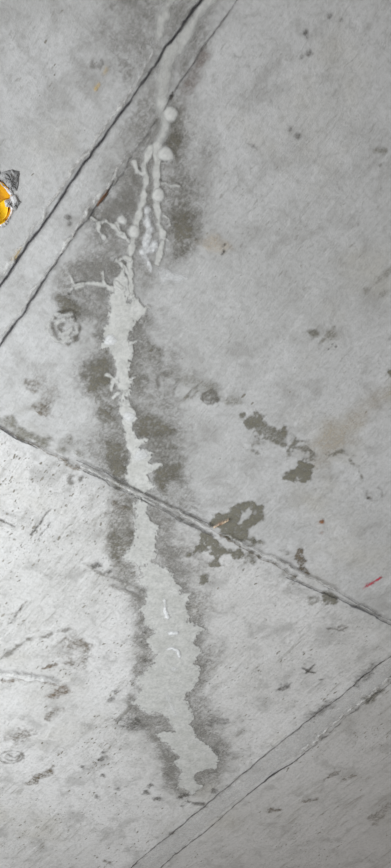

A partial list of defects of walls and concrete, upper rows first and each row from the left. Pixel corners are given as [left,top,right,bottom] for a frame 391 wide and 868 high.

damp [61,100,198,321]
damp [83,347,117,423]
damp [94,439,131,488]
damp [129,367,181,489]
damp [108,531,134,566]